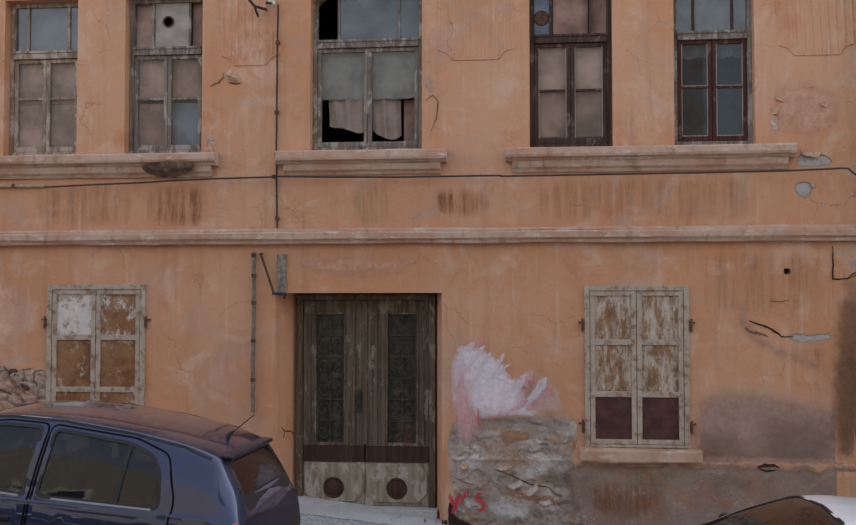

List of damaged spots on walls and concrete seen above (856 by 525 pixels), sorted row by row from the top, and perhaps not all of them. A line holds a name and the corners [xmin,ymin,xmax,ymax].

peeling [797,149,831,167]
peeling [795,182,816,199]
crack [832,246,856,280]
spalling [0,366,46,411]
water stain [700,395,836,462]
spalling [446,417,856,525]